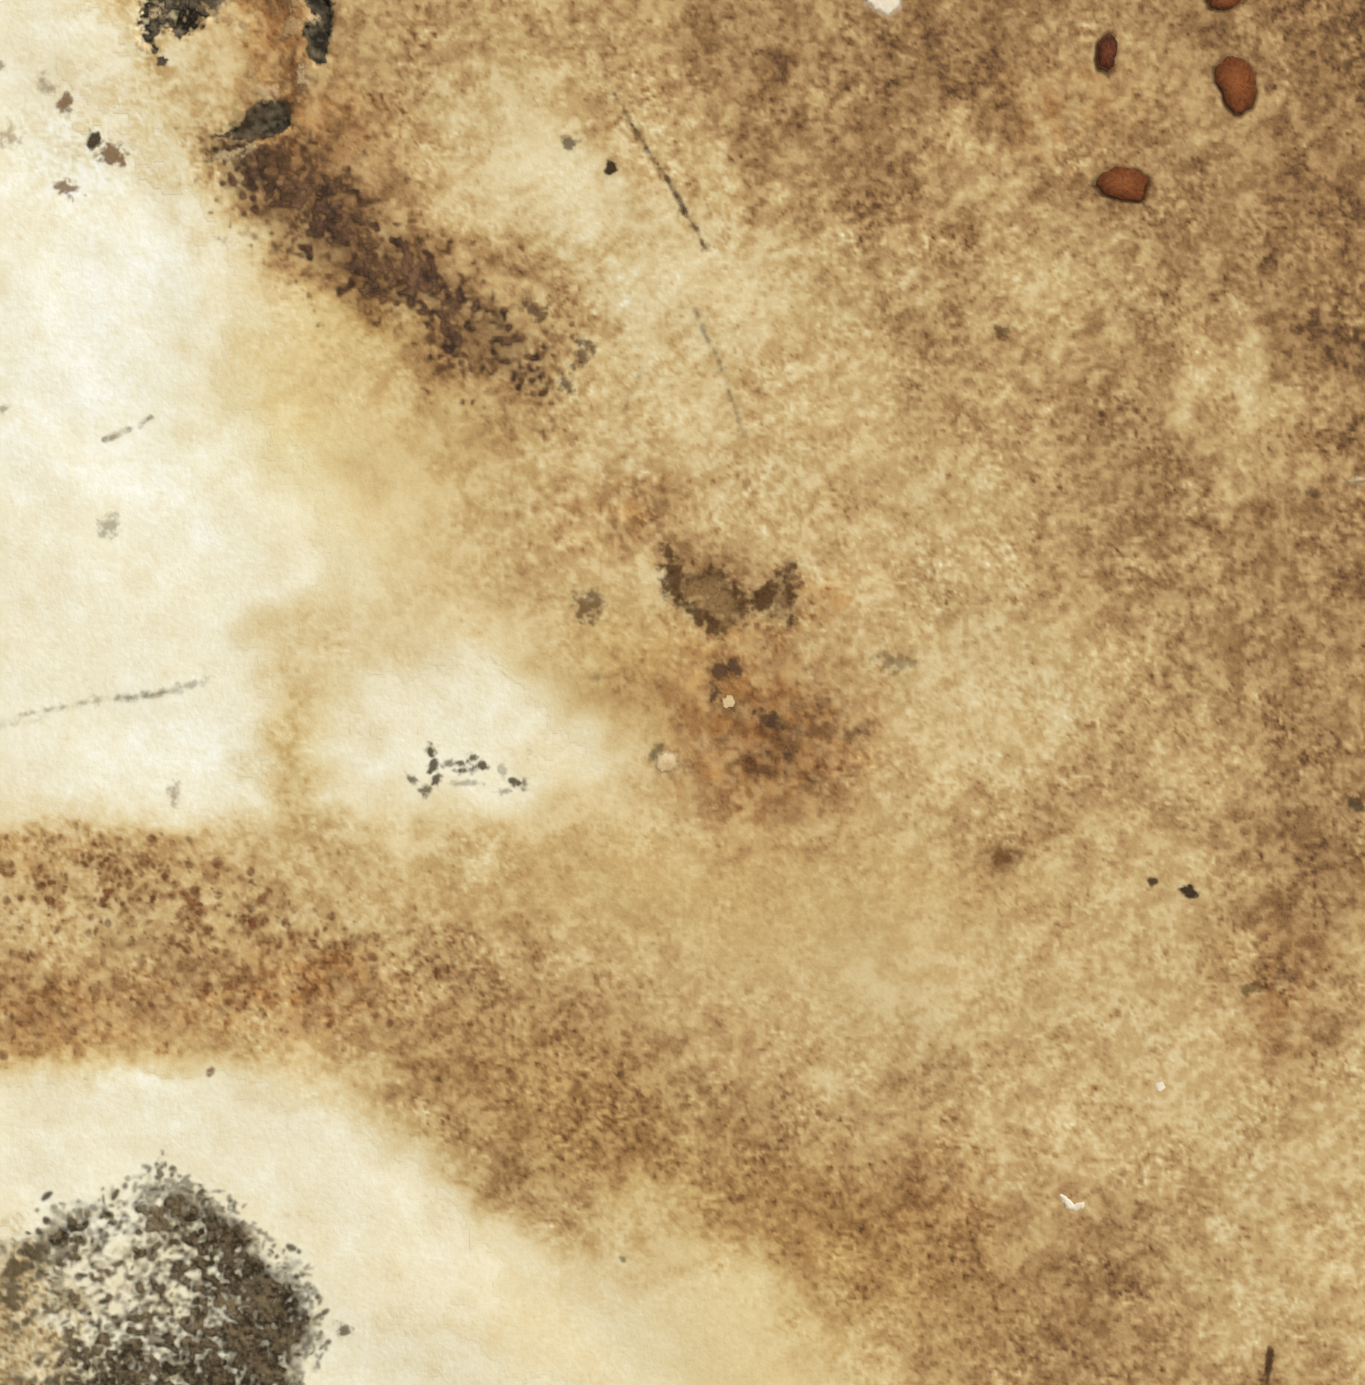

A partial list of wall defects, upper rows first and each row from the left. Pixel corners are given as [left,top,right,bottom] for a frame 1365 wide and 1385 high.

corrosion [1206,0,1241,11]
corrosion [1095,32,1118,74]
corrosion [1214,56,1258,116]
damp [227,143,363,246]
corrosion [1096,166,1151,202]
damp [299,244,313,260]
damp [343,253,361,275]
damp [359,257,388,303]
damp [381,237,469,357]
damp [489,333,525,346]
damp [0,780,592,1167]
damp [0,1163,350,1385]